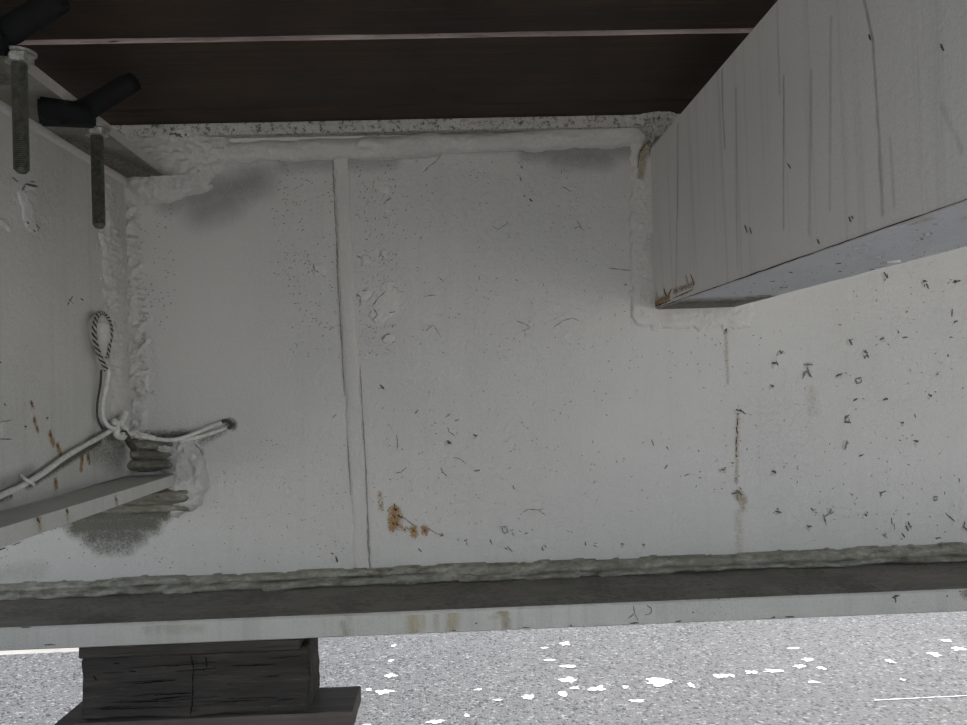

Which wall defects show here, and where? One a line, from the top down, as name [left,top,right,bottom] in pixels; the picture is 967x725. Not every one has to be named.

rust [655,274,694,307]
rust [30,400,62,457]
damp [62,512,171,553]
rust [377,492,429,538]